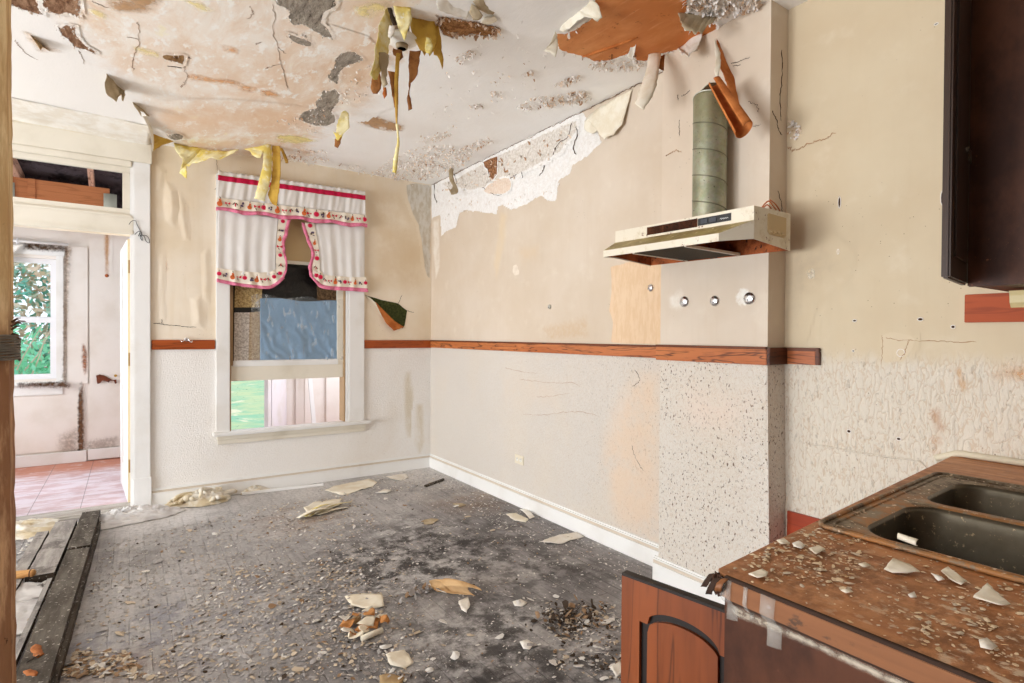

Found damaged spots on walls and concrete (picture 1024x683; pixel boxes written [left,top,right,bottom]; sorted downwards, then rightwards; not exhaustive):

peeling [11,0,100,55]
peeling [159,52,188,66]
crack [247,4,288,88]
peeling [271,0,341,48]
peeling [277,49,380,134]
flaking render [376,0,762,250]
crack [748,51,832,152]
crack [881,337,975,361]
damp [400,367,428,455]